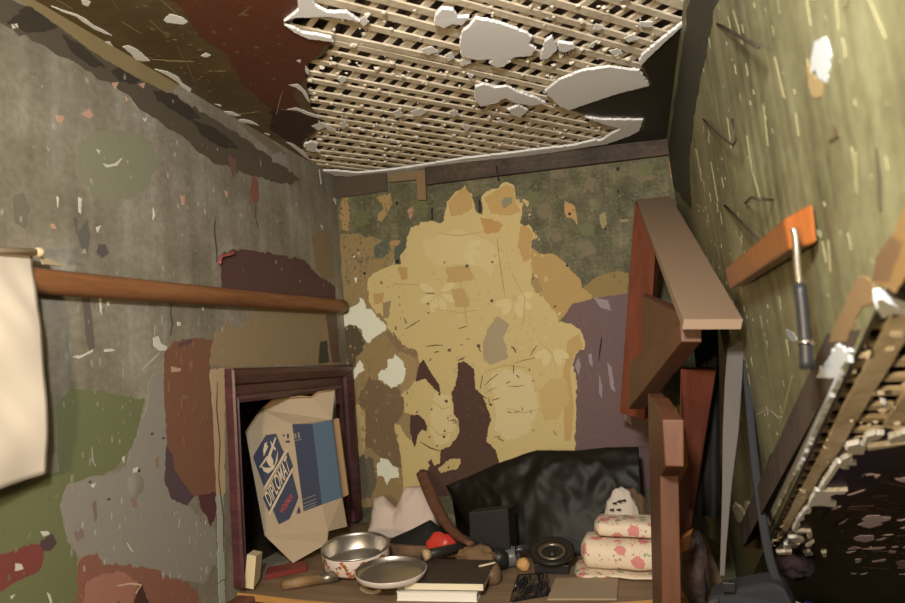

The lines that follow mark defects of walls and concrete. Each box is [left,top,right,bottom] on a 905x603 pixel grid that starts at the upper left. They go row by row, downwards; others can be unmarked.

peeling [164,0,683,164]
peeling [811,37,832,82]
spalling [732,206,905,549]
peeling [153,225,419,603]
peeling [0,531,49,599]
peeling [75,552,199,603]
peeling [846,515,905,575]